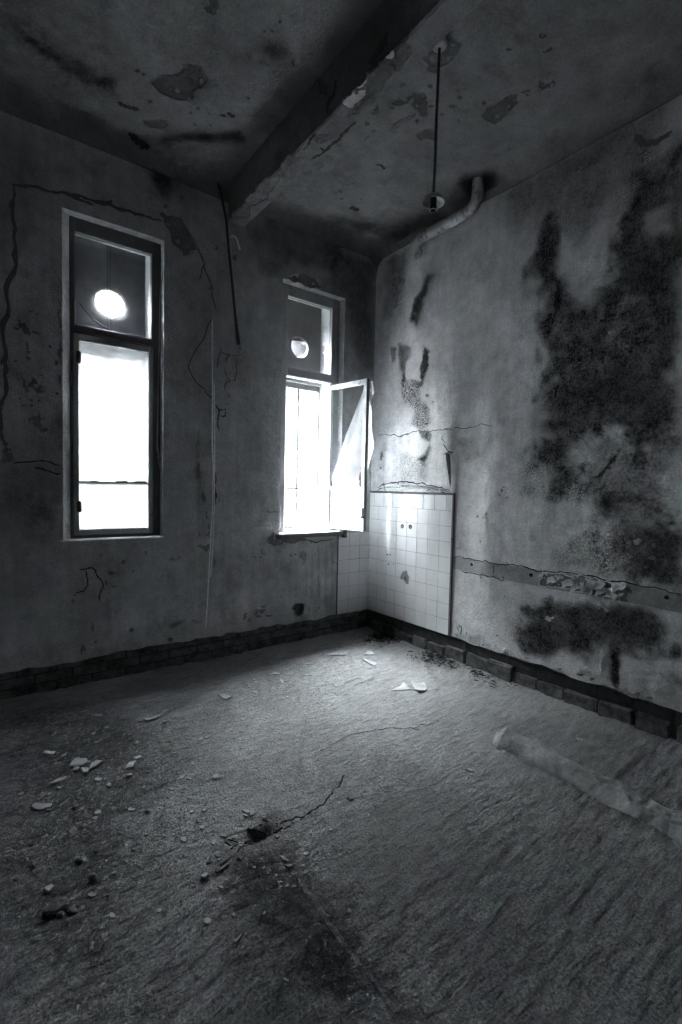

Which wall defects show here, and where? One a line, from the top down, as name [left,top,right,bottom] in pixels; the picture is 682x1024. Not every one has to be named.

peeling [134,63,213,126]
peeling [341,39,463,142]
peeling [479,79,557,124]
crack [0,183,165,475]
damp [403,275,432,324]
damp [508,109,682,582]
crack [215,348,237,429]
damp [391,345,430,484]
crack [382,423,490,442]
peeling [528,572,626,612]
damp [511,598,681,687]
crack [280,775,345,824]